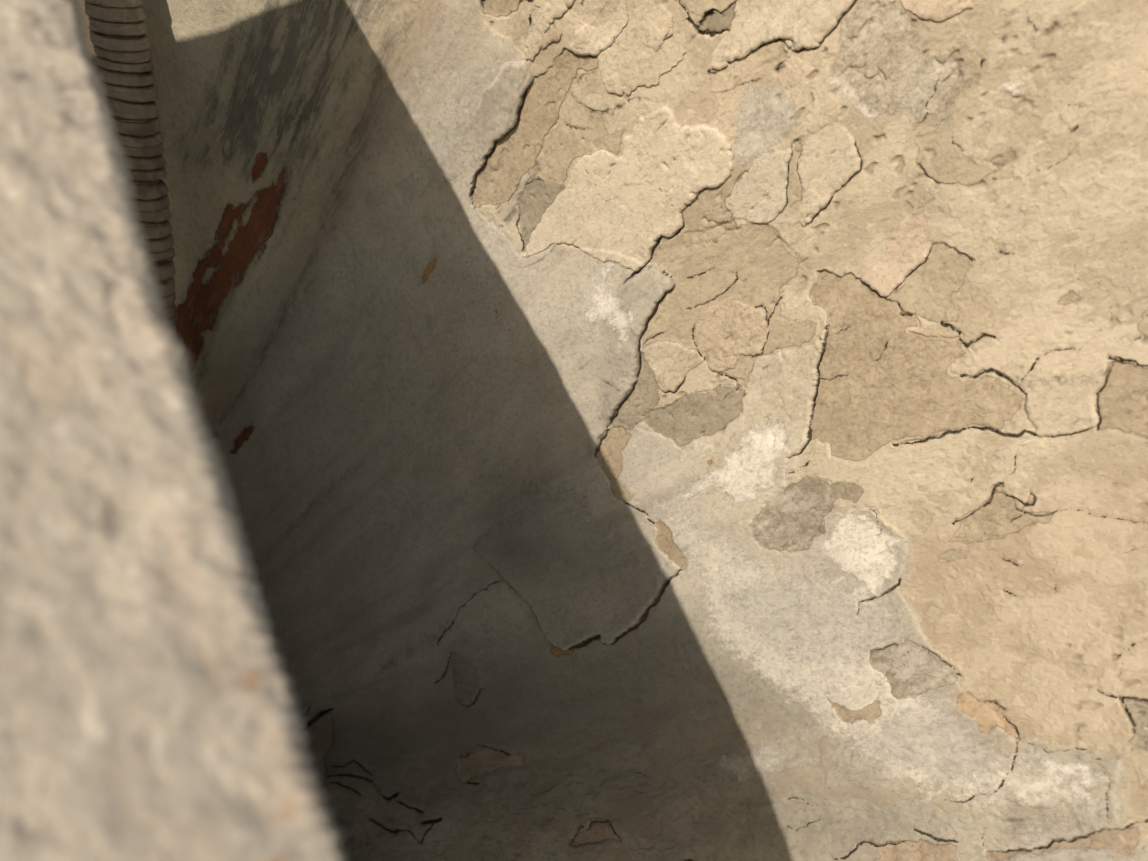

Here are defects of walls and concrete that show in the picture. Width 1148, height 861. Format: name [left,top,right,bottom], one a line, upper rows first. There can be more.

damp [205,0,370,168]
rust [175,152,286,370]
rust [230,426,256,454]
crack [579,184,739,456]
spalling [471,0,1148,570]
crack [789,324,848,473]
crack [862,244,996,361]
crack [893,264,1148,553]
peeling [474,548,663,651]
spalling [827,698,882,724]
spalling [869,640,1019,739]
crack [835,701,1148,860]